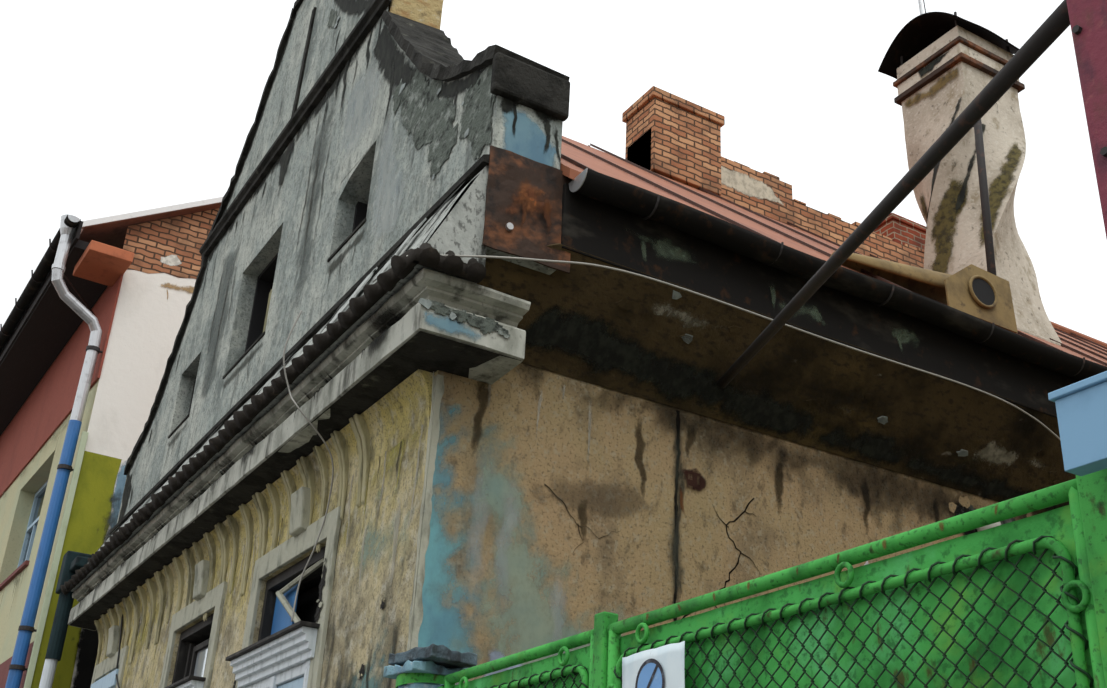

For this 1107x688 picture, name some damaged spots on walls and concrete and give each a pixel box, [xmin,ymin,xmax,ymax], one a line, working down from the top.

water stain [334,0,373,16]
flaking render [391,65,496,180]
water stain [174,16,488,369]
water stain [97,379,168,551]
water stain [418,436,590,677]
crack [544,484,619,553]
water stain [635,423,646,486]
crack [673,411,681,529]
crack [674,498,760,621]
water stain [658,403,797,594]
water stain [837,459,973,525]
flaking render [949,496,976,513]